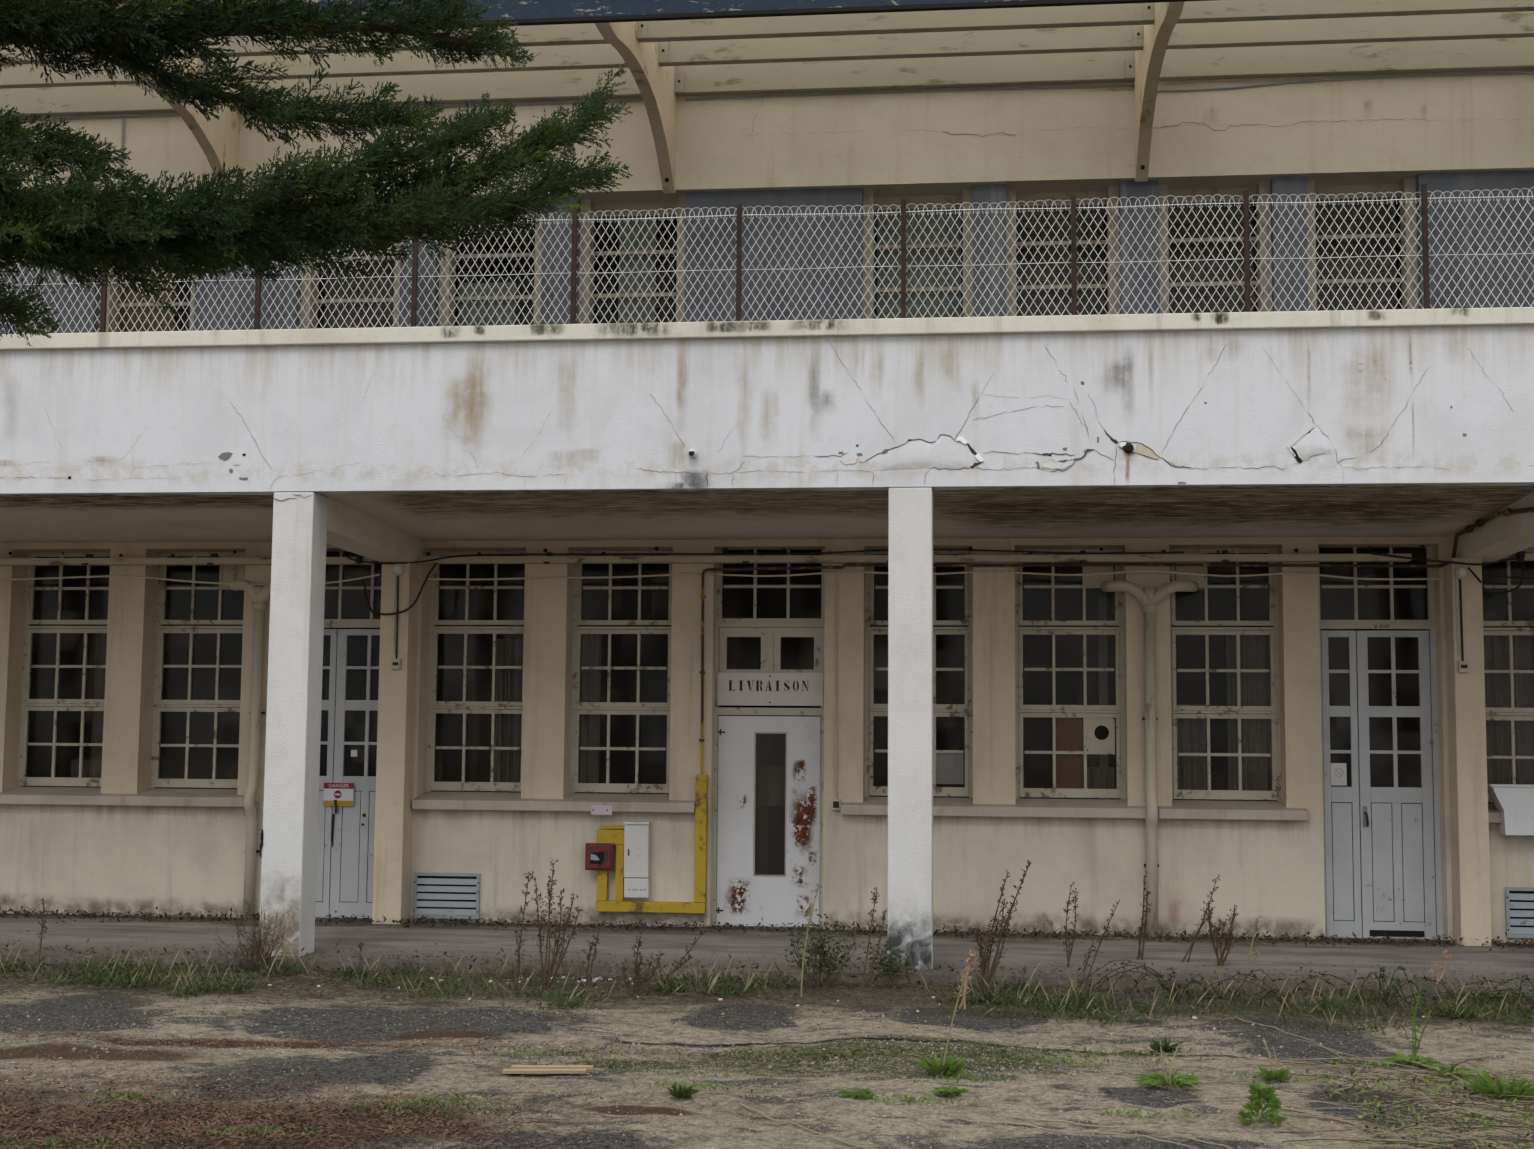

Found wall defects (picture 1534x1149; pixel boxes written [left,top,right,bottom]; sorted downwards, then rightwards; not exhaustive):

crack [636,341,1446,485]
rust [793,761,816,916]